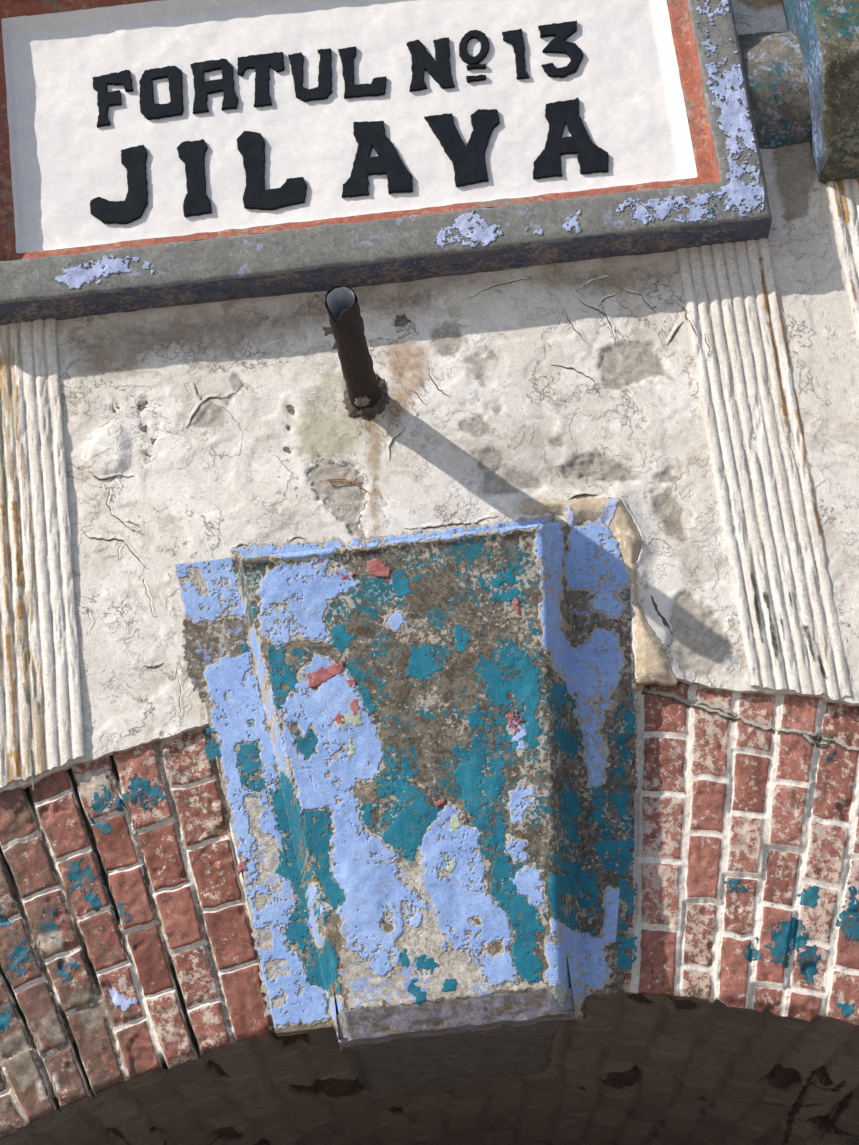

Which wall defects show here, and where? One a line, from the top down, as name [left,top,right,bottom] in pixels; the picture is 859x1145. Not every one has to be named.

corrosion [833,179,859,224]
crack [550,271,714,398]
corrosion [759,257,810,474]
corrosion [0,501,23,619]
crack [80,481,158,617]
crack [404,513,498,530]
corrosion [6,634,21,777]
peeling [80,768,165,835]
peeling [181,455,652,1046]
crack [641,688,859,753]
peeling [744,886,821,987]
peeling [836,882,859,942]